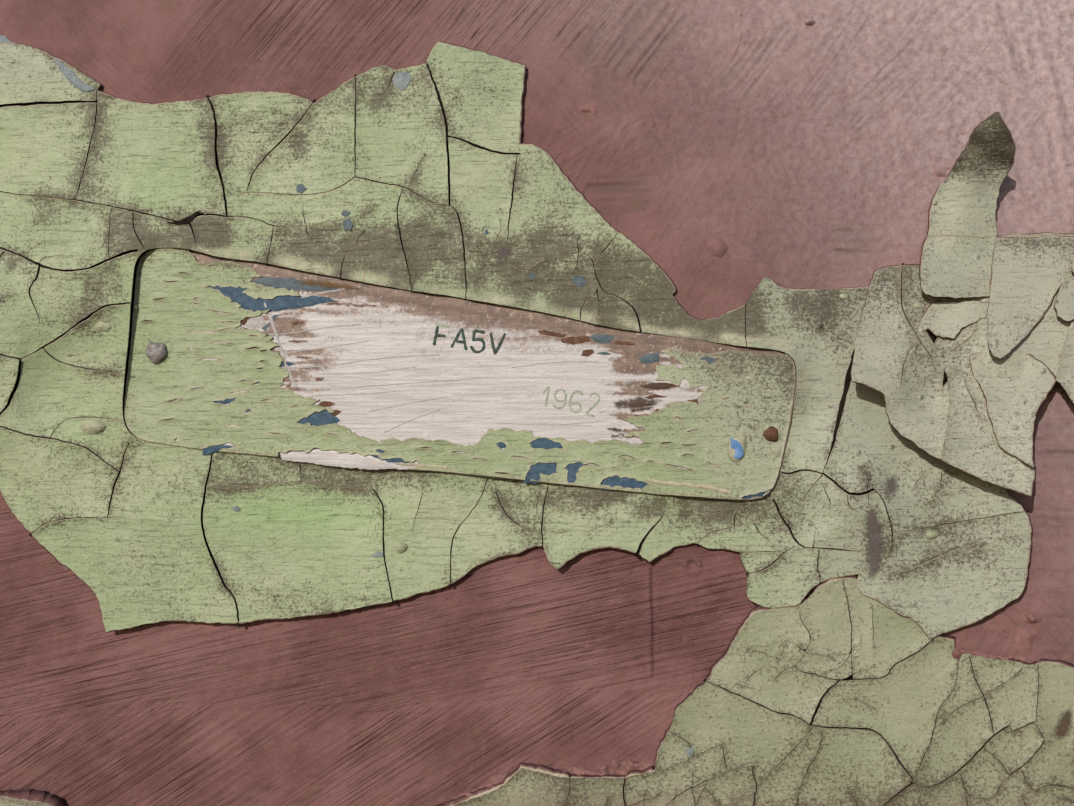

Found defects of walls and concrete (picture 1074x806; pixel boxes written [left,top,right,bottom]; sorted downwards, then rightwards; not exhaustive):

crack [0,64,644,537]
peeling [0,35,1074,640]
crack [201,452,241,627]
crack [373,490,396,605]
crack [450,479,548,588]
crack [634,498,662,558]
crack [695,500,851,584]
crack [782,349,893,549]
peeling [0,788,64,806]
peeling [435,575,1074,806]
crack [703,629,1074,805]